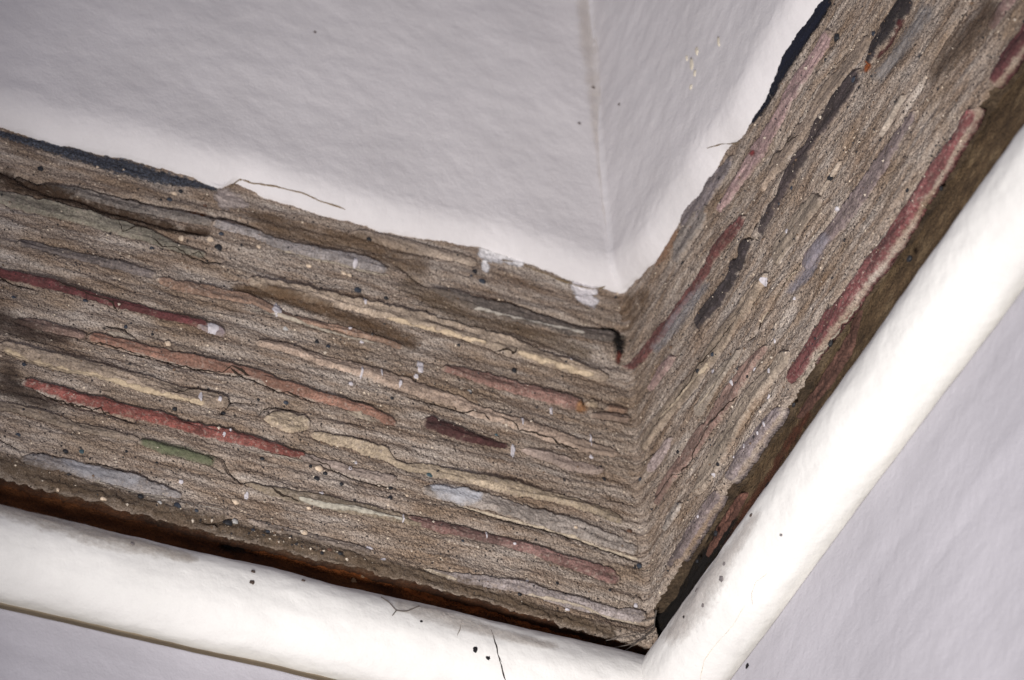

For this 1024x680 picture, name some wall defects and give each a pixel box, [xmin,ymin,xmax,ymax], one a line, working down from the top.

spalling [214,188,249,210]
crack [230,179,344,209]
leakage [299,497,403,520]